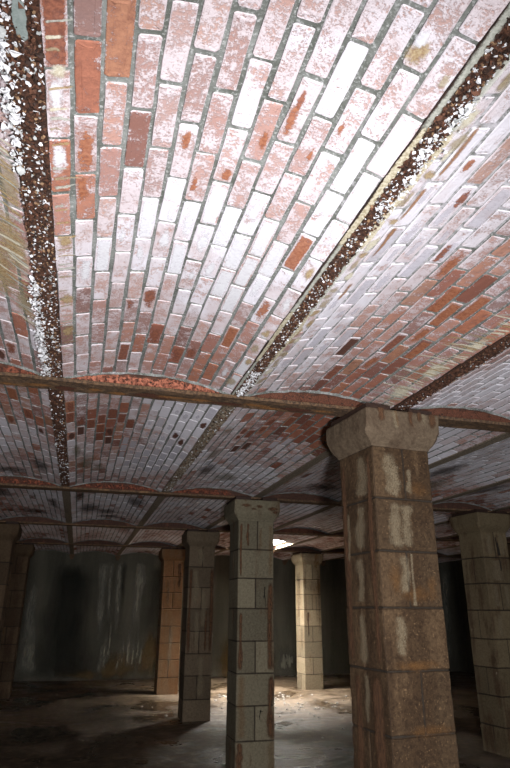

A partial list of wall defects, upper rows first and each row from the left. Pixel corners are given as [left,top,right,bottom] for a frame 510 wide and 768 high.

damp [21,591,35,670]
damp [98,565,124,621]